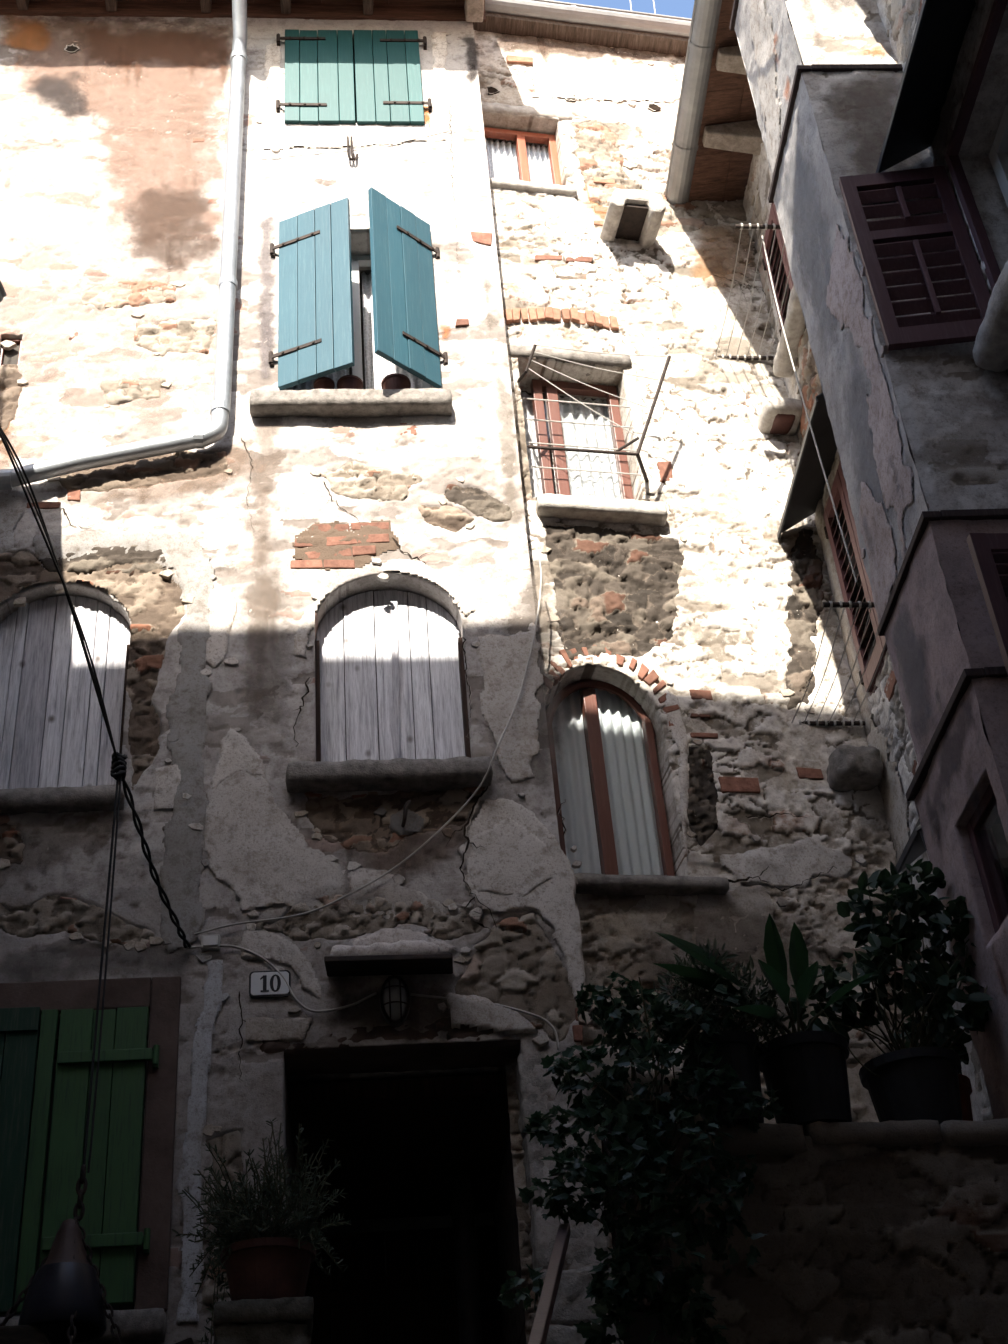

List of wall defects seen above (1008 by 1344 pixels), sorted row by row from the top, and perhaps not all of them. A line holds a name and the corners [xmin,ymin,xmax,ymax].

water stain [15,17,229,232]
spalling [79,280,217,357]
spalling [0,340,29,443]
spalling [100,378,172,408]
spalling [310,461,512,533]
flaking render [290,519,399,582]
spalling [0,545,195,790]
spalling [294,787,485,871]
crack [445,786,519,965]
spalling [0,895,164,952]